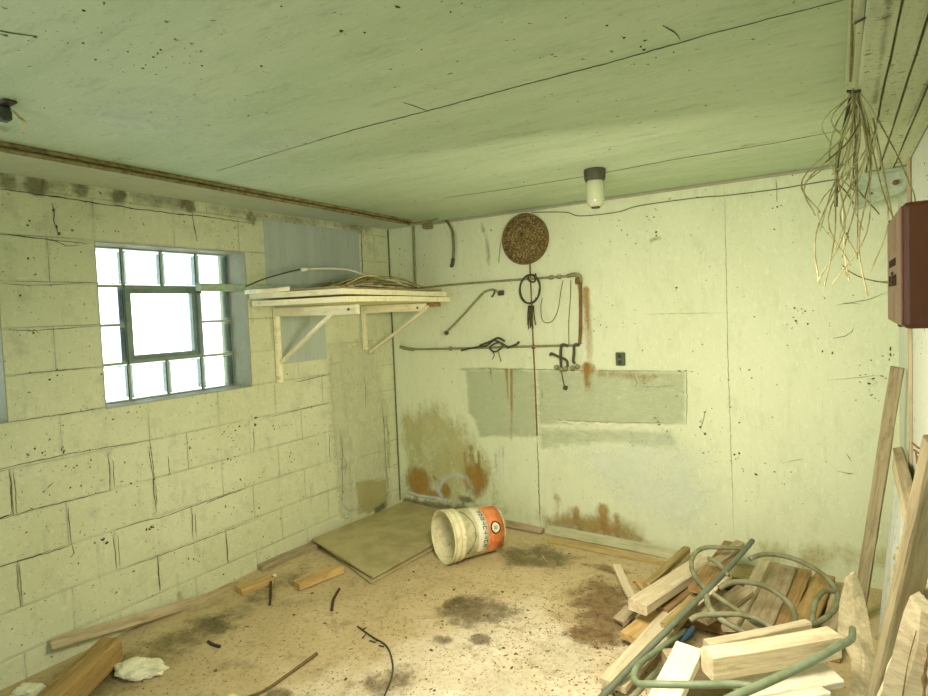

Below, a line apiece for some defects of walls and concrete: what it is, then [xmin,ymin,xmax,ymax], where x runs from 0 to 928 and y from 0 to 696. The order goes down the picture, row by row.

crack [0,29,37,37]
crack [0,189,248,246]
corrosion [578,284,589,330]
corrosion [408,469,450,499]
corrosion [464,447,487,494]
crack [0,439,252,606]
corrosion [548,505,634,538]